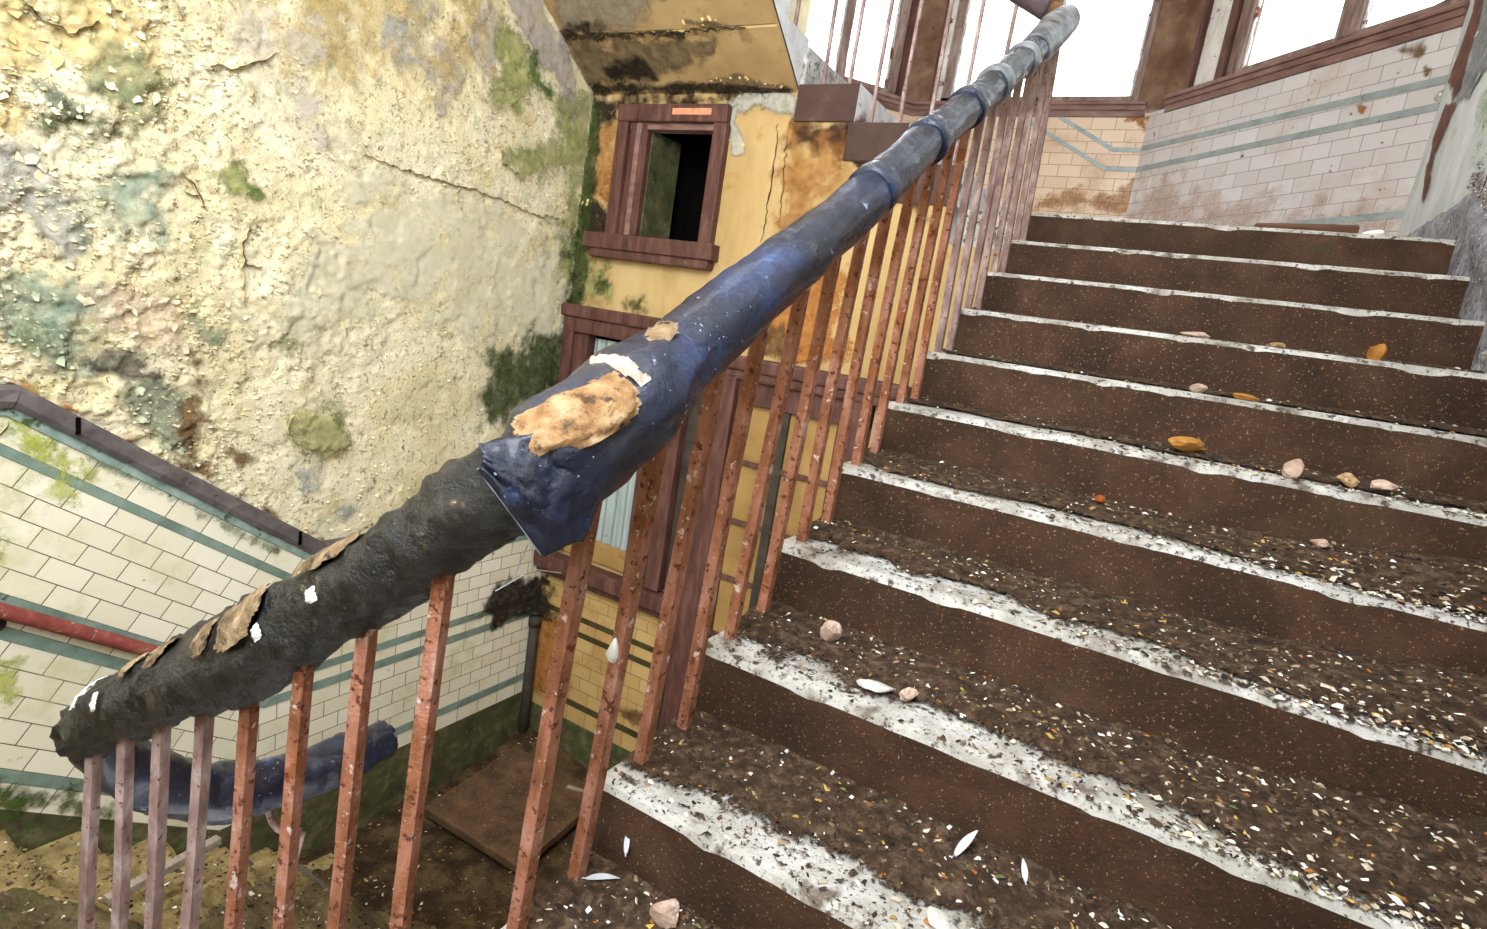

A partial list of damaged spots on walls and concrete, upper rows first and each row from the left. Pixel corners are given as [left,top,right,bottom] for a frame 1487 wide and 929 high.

damp [559,29,697,42]
flaking render [1422,0,1487,203]
crack [363,149,568,226]